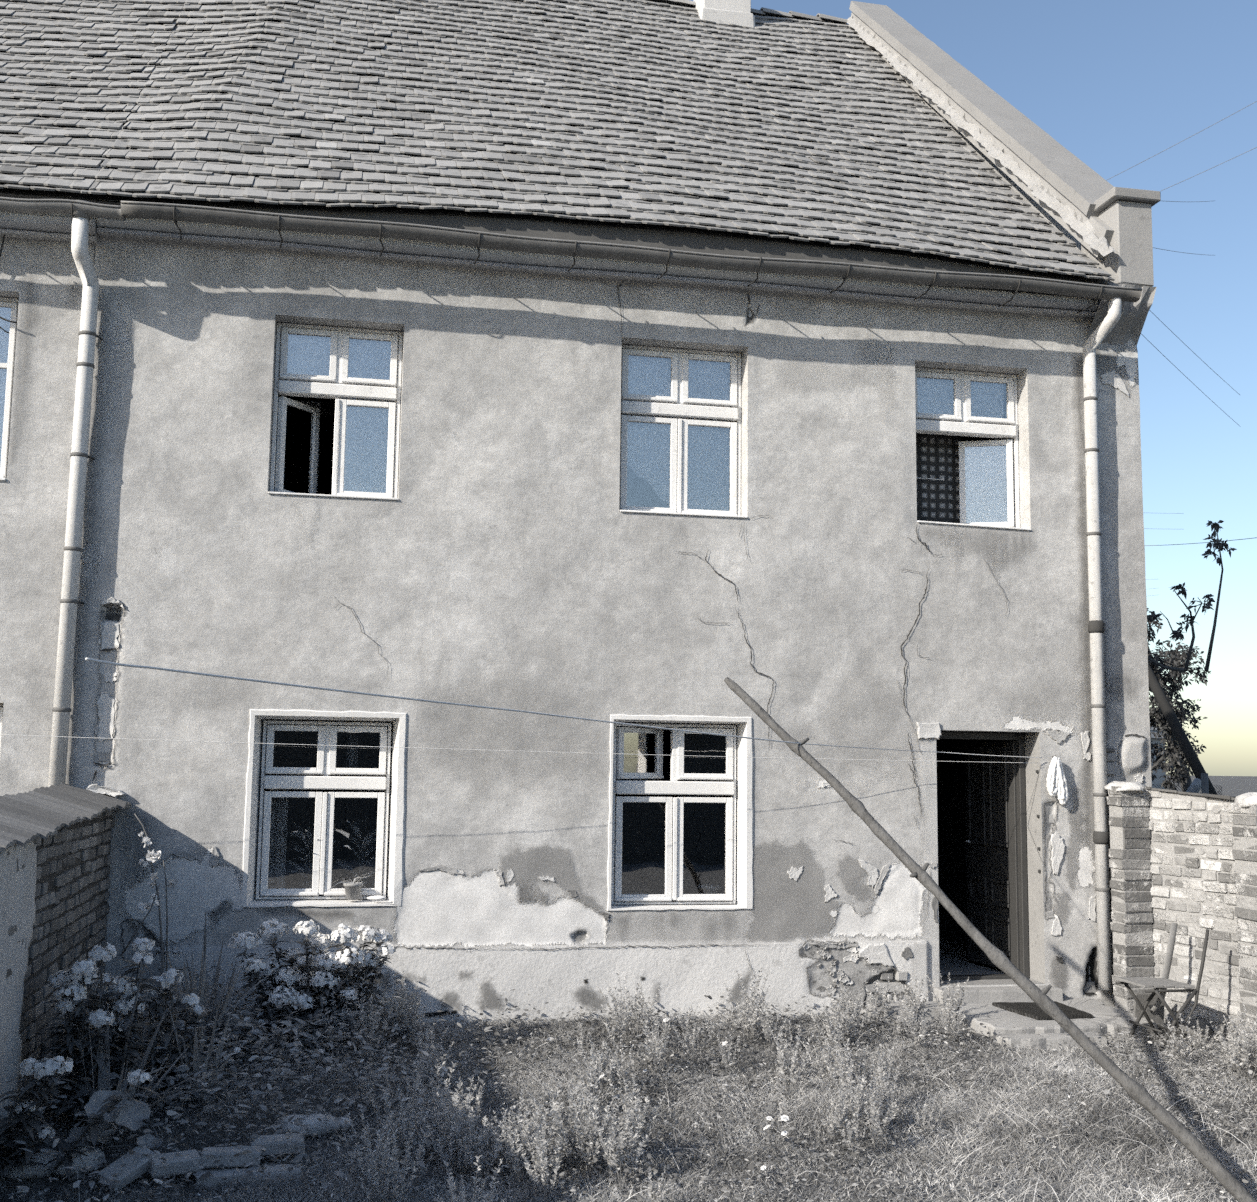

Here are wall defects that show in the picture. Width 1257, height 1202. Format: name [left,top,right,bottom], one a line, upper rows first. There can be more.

flaking render [1096,339,1138,397]
crack [676,515,774,748]
crack [898,527,942,829]
flaking render [121,846,244,962]
flaking render [393,845,610,952]
flaking render [748,722,941,1009]
spalling [1043,801,1096,936]